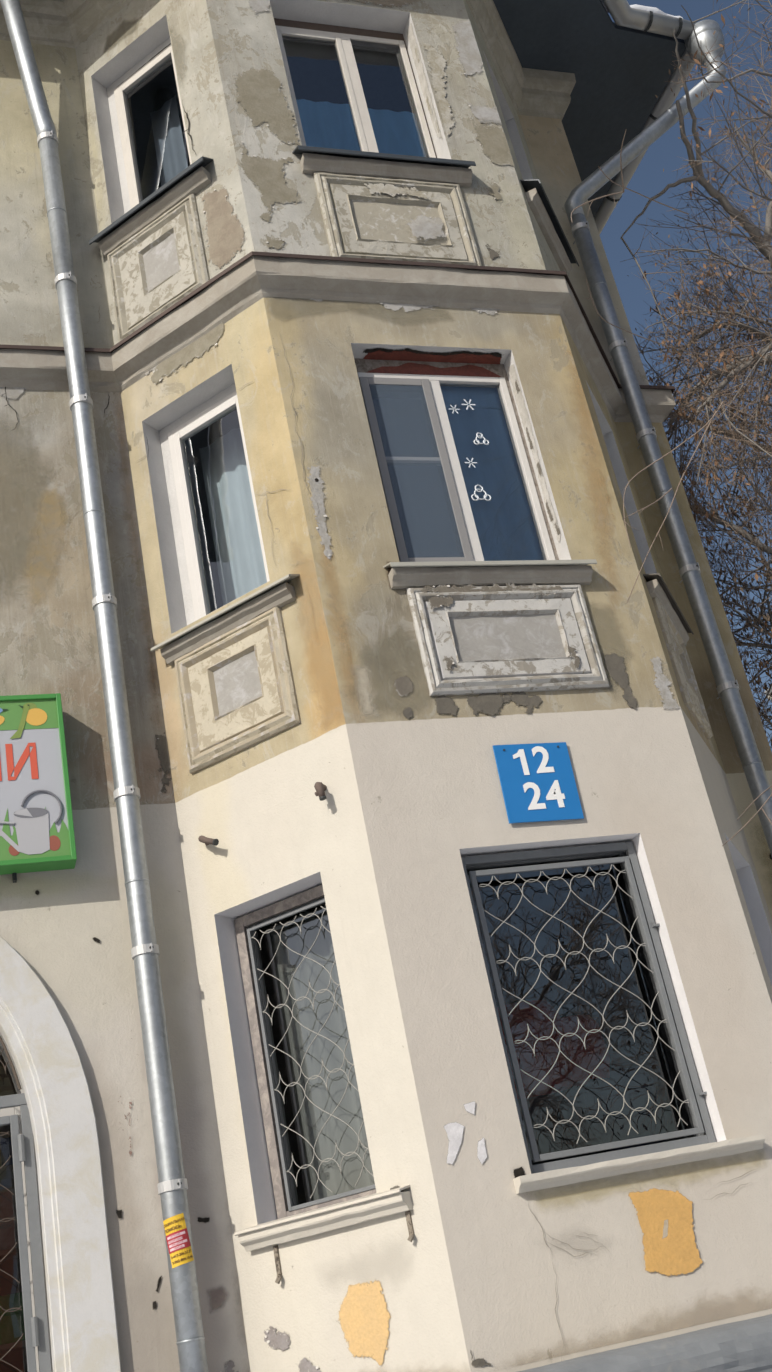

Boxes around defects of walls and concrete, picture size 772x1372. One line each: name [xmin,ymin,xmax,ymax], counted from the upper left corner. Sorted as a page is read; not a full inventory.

peeling [452,20,484,76]
peeling [233,68,303,249]
peeling [468,103,515,167]
peeling [487,182,502,201]
peeling [202,185,247,270]
crack [528,1203,610,1361]
peeling [264,1326,290,1351]
peeling [298,1357,321,1372]